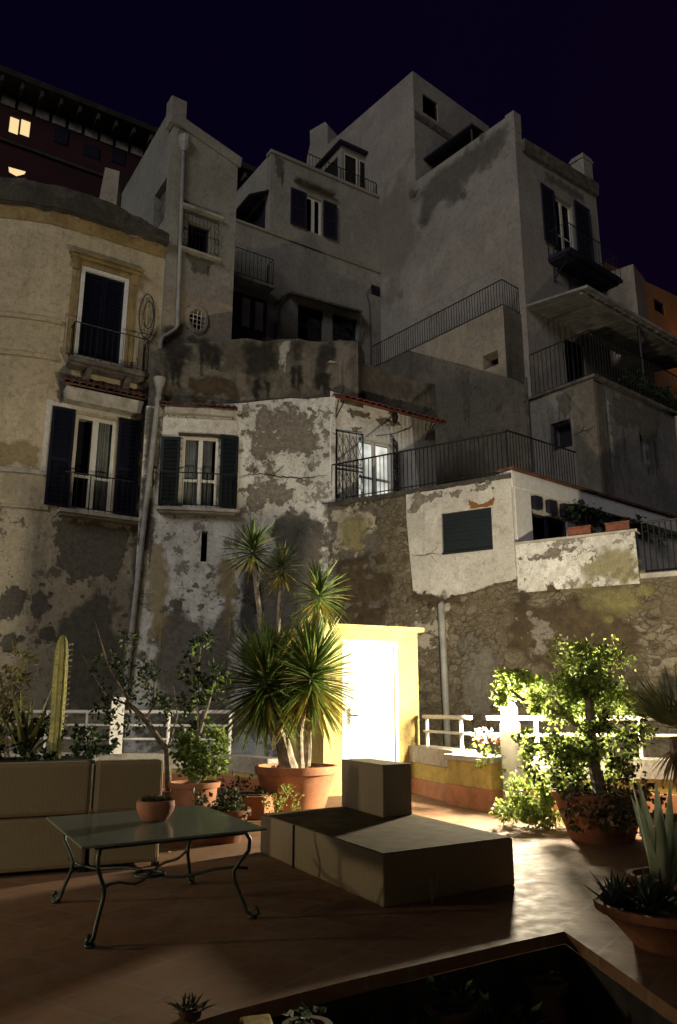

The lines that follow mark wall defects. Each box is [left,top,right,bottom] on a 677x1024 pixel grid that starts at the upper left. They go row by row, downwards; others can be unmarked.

water stain [409,130,504,225]
water stain [163,326,220,386]
water stain [242,340,355,402]
peeling [53,519,131,585]
crack [242,466,326,479]
peeling [237,401,388,645]
flaking render [405,479,496,513]
flaking render [518,543,596,582]
peeling [0,583,128,710]
peeling [133,572,241,750]